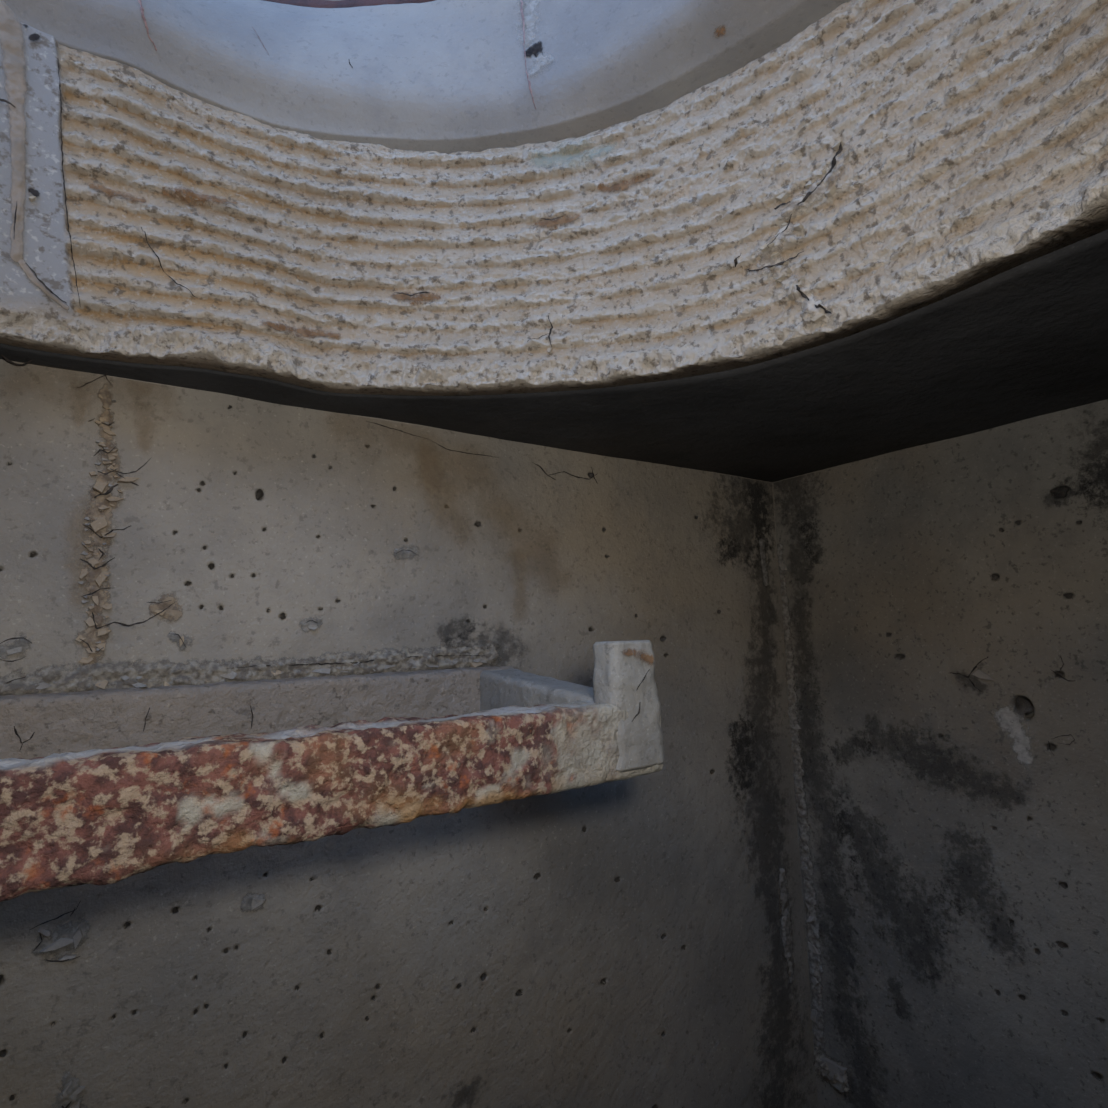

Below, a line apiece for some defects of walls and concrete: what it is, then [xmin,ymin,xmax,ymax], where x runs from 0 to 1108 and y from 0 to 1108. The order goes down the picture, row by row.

crack [734,141,850,324]
spalling [75,373,189,665]
leakage [995,706,1033,764]
spalling [30,902,90,962]